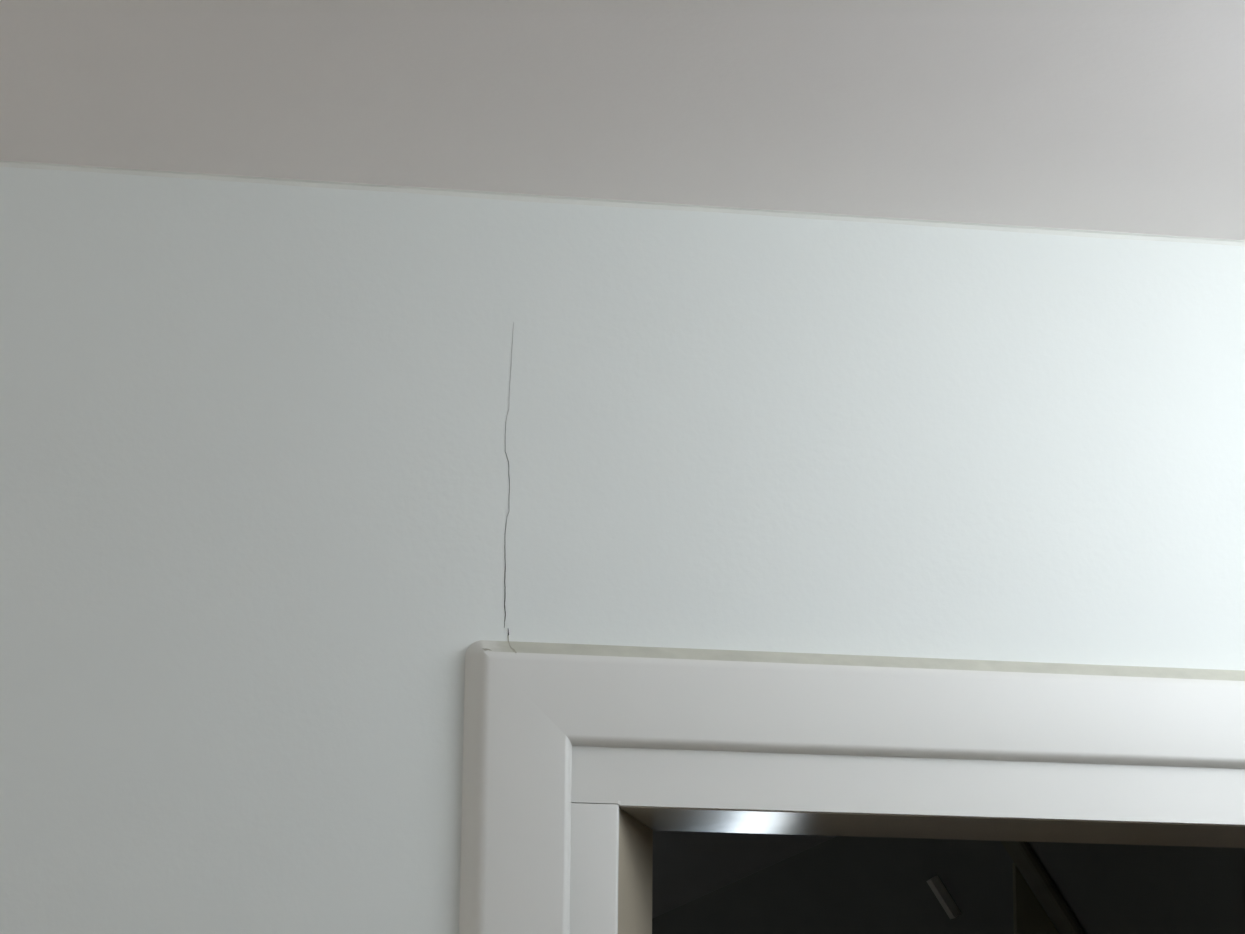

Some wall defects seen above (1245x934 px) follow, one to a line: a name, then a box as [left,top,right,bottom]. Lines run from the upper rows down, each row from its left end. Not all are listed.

crack [482,562,517,653]